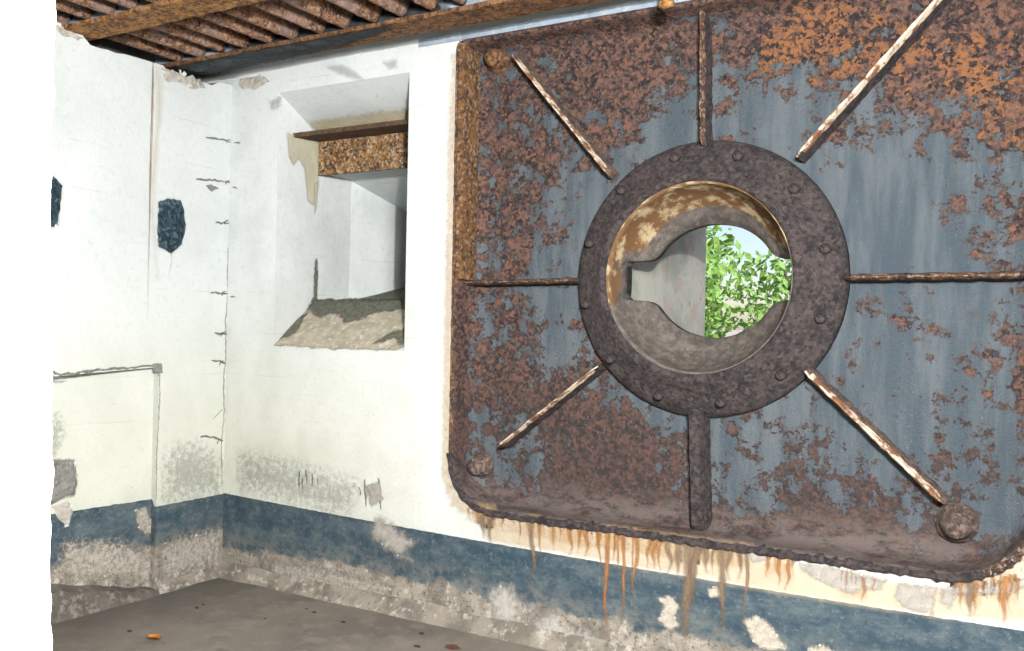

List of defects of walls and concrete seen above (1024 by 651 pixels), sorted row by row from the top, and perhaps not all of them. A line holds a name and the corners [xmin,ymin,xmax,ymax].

peeling [50,176,62,229]
peeling [157,199,186,254]
crack [196,178,237,189]
crack [201,265,234,479]
corrosion [443,97,902,629]
crack [53,365,161,500]
spalling [50,459,78,527]
peeling [134,507,151,534]
peeling [58,528,223,582]
peeling [658,595,679,630]
peeling [743,615,787,651]
corrosion [932,558,1024,619]